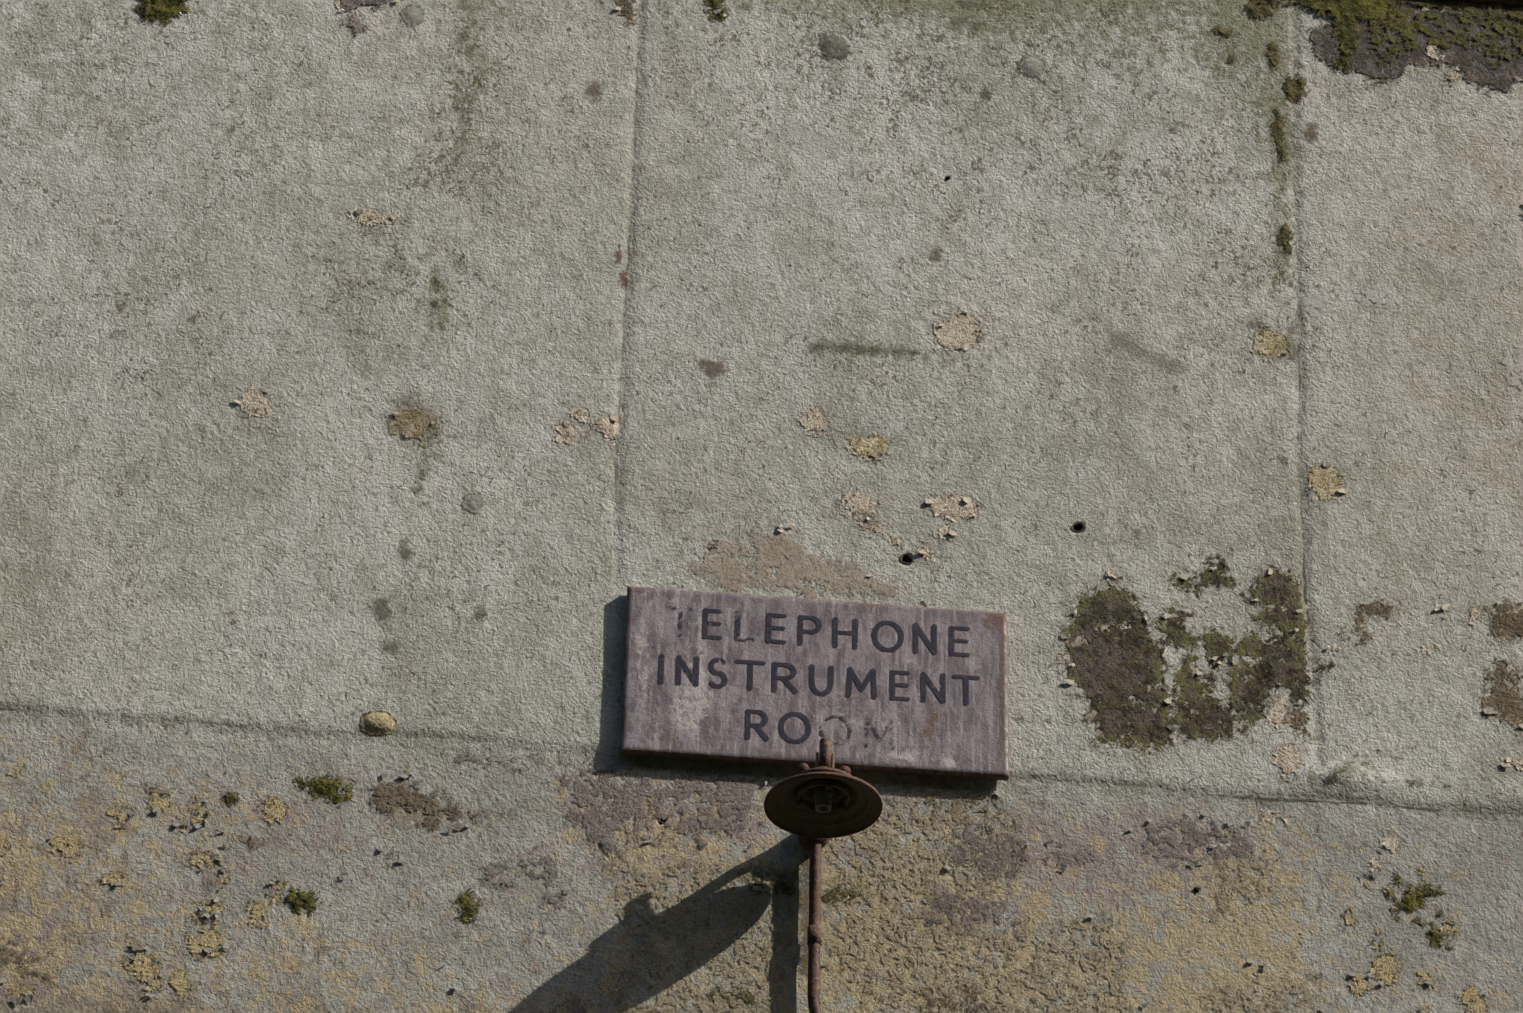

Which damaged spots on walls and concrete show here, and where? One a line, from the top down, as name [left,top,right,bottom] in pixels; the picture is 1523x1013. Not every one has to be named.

peeling [927,305,987,353]
peeling [552,405,624,449]
peeling [838,486,985,564]
peeling [45,828,86,863]
peeling [1360,826,1431,892]
peeling [105,786,293,1013]
peeling [0,935,56,1005]
peeling [1342,905,1439,1013]
peeling [1456,982,1490,1013]